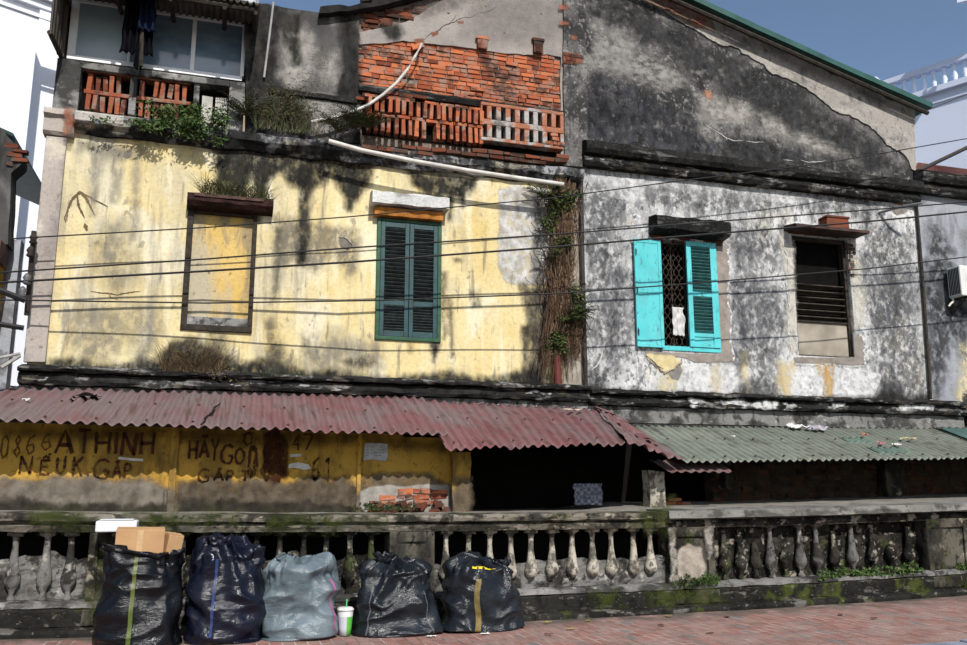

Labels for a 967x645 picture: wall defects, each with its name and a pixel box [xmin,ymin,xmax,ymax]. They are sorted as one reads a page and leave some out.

leakage [587,0,901,170]
leakage [213,149,373,281]
peeling [644,235,881,409]
flaking render [360,484,451,513]